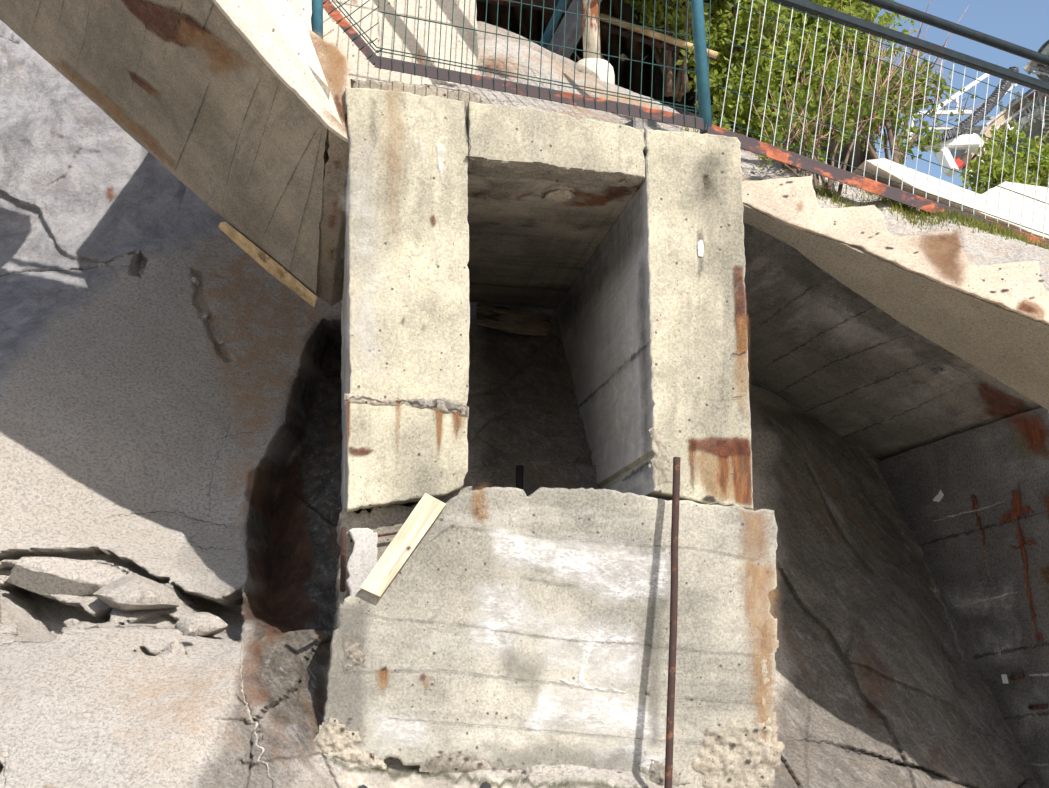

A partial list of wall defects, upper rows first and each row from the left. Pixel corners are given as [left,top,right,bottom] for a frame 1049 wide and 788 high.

corrosion [122,0,243,70]
corrosion [927,234,965,279]
corrosion [733,266,748,366]
crack [341,326,469,419]
corrosion [347,401,373,455]
corrosion [435,407,460,445]
corrosion [978,383,1046,453]
corrosion [689,436,764,550]
corrosion [1000,491,1049,642]
spalling [591,618,785,788]
spalling [314,716,386,770]
spalling [419,751,541,777]